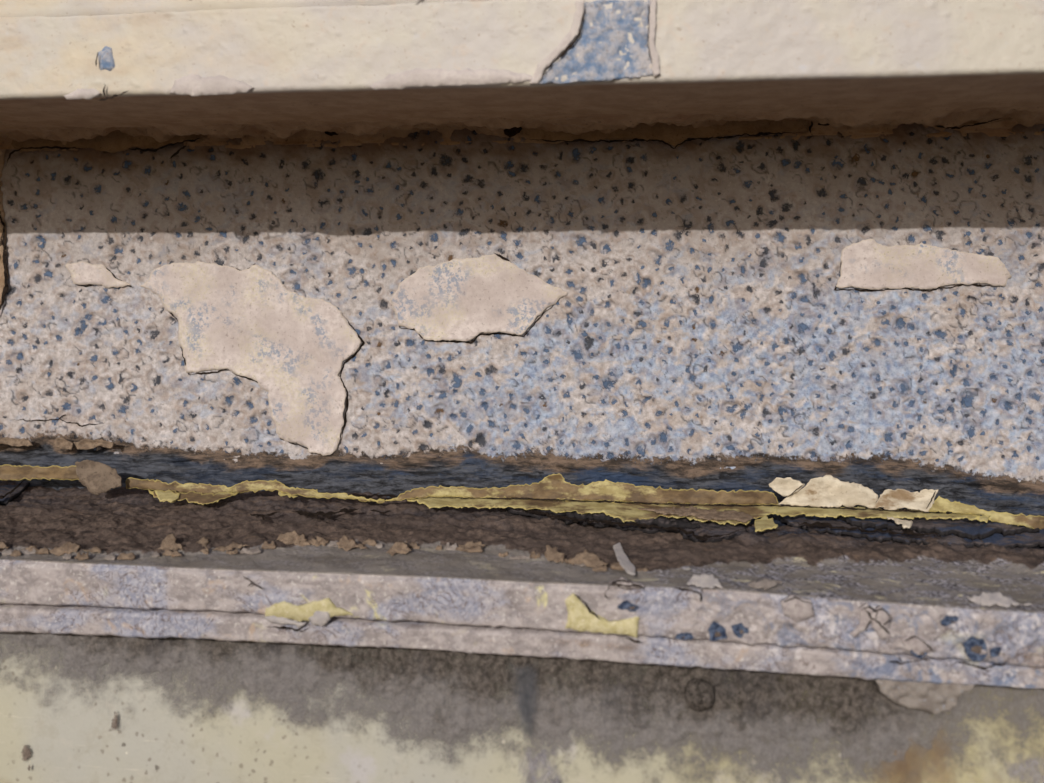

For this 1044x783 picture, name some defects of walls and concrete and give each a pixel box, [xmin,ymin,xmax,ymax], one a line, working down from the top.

peeling [369,0,660,90]
crack [0,212,9,310]
peeling [0,118,1044,541]
peeling [151,533,184,558]
peeling [196,530,420,556]
peeling [435,541,487,553]
peeling [498,545,648,572]
peeling [263,598,353,631]
peeling [565,593,641,643]
spalling [708,622,749,641]
spalling [941,615,959,626]
water stain [21,745,31,771]